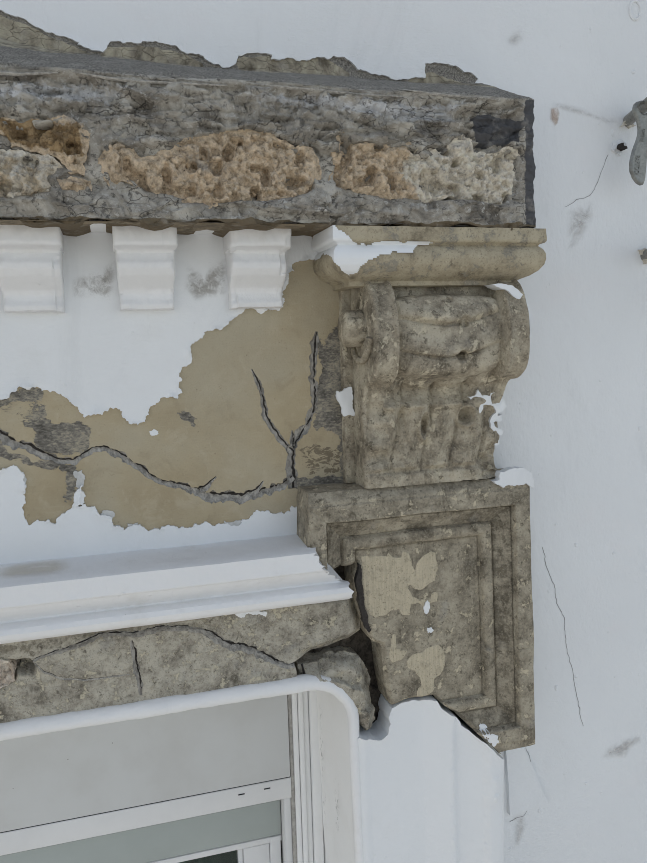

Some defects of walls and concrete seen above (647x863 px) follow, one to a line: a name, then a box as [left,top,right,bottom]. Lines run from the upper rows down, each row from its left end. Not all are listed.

spalling [0,114,93,198]
spalling [98,129,520,209]
peeling [170,222,225,233]
crack [0,331,319,505]
peeling [0,259,355,531]
crack [32,625,305,695]